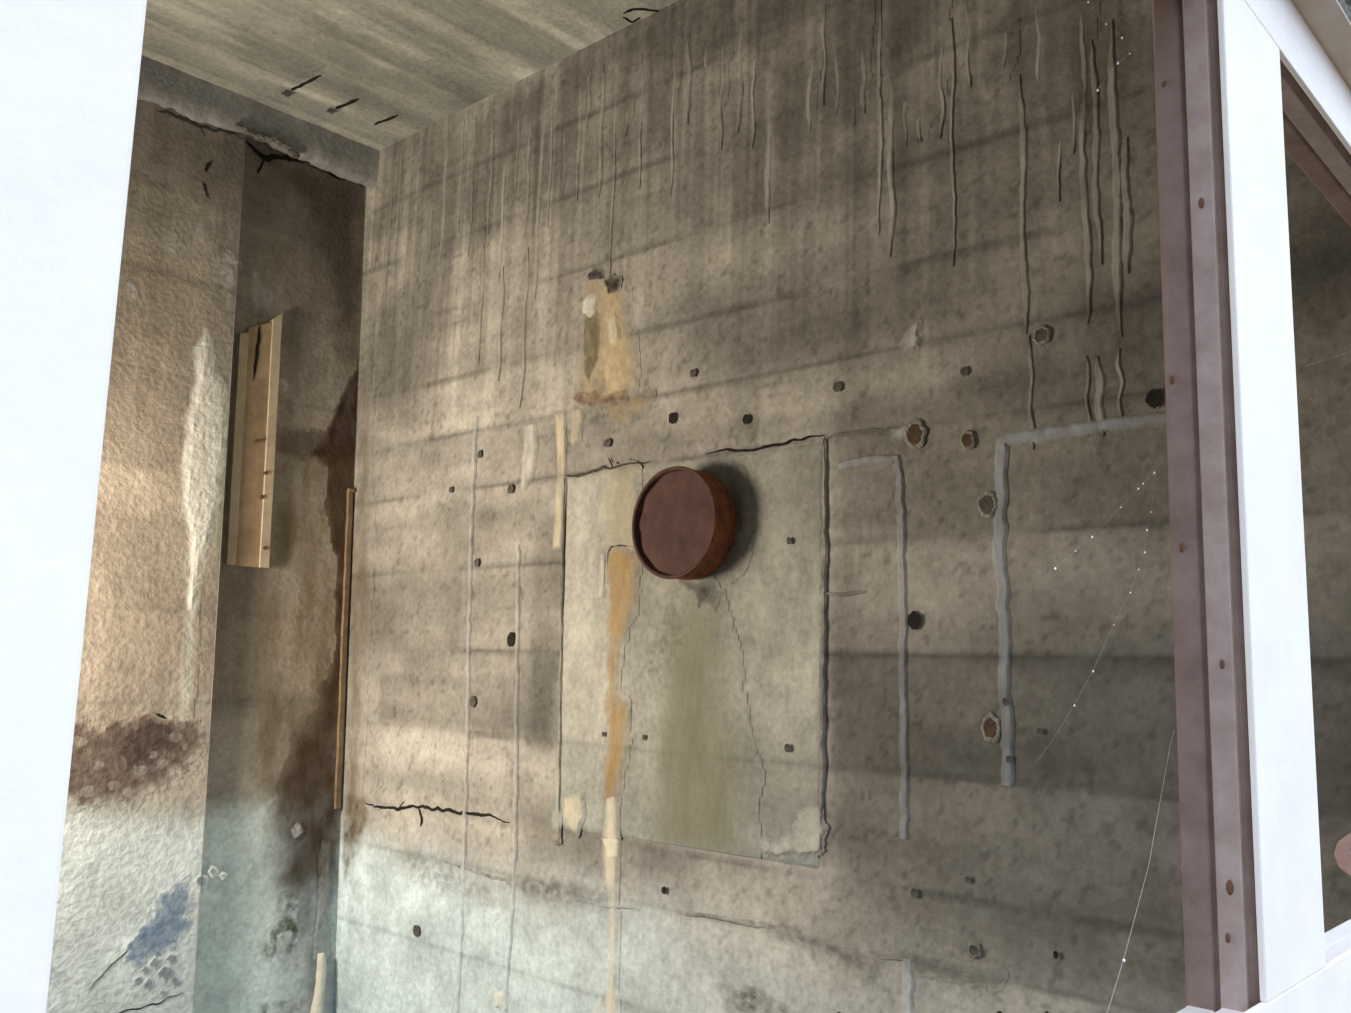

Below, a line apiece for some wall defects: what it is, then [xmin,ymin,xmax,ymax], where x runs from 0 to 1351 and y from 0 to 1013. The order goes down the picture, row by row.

crack [156,110,364,186]
spalling [570,265,656,432]
damp [67,318,231,814]
crack [557,458,649,830]
rust [550,459,643,1013]
crack [365,801,639,923]
crack [90,937,136,988]
crack [119,992,182,1013]